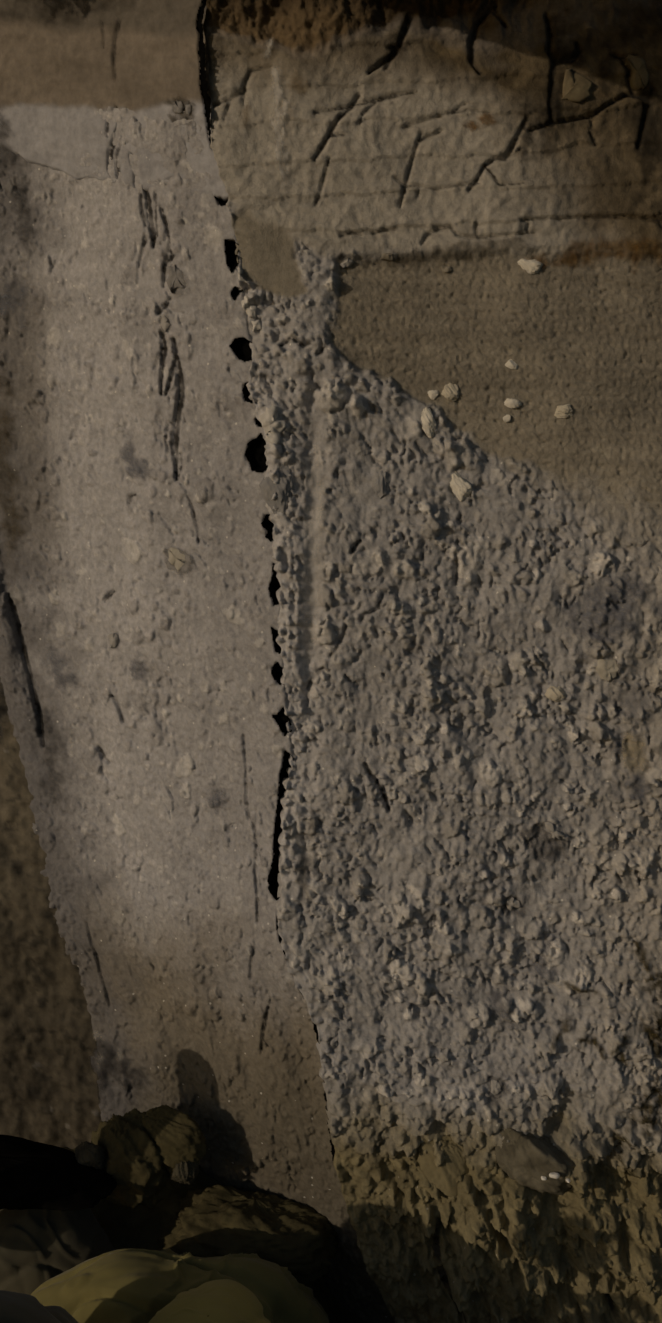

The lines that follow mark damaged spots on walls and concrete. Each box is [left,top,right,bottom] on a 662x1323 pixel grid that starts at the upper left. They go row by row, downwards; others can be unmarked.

crack [184,0,212,144]
crack [314,16,413,166]
crack [471,18,652,187]
crack [224,239,243,300]
spalling [236,266,261,332]
spalling [259,405,286,445]
crack [229,337,325,472]
crack [261,514,294,955]
crack [365,763,390,810]
spalling [520,821,567,861]
crack [298,989,320,1044]
crack [324,1082,335,1161]